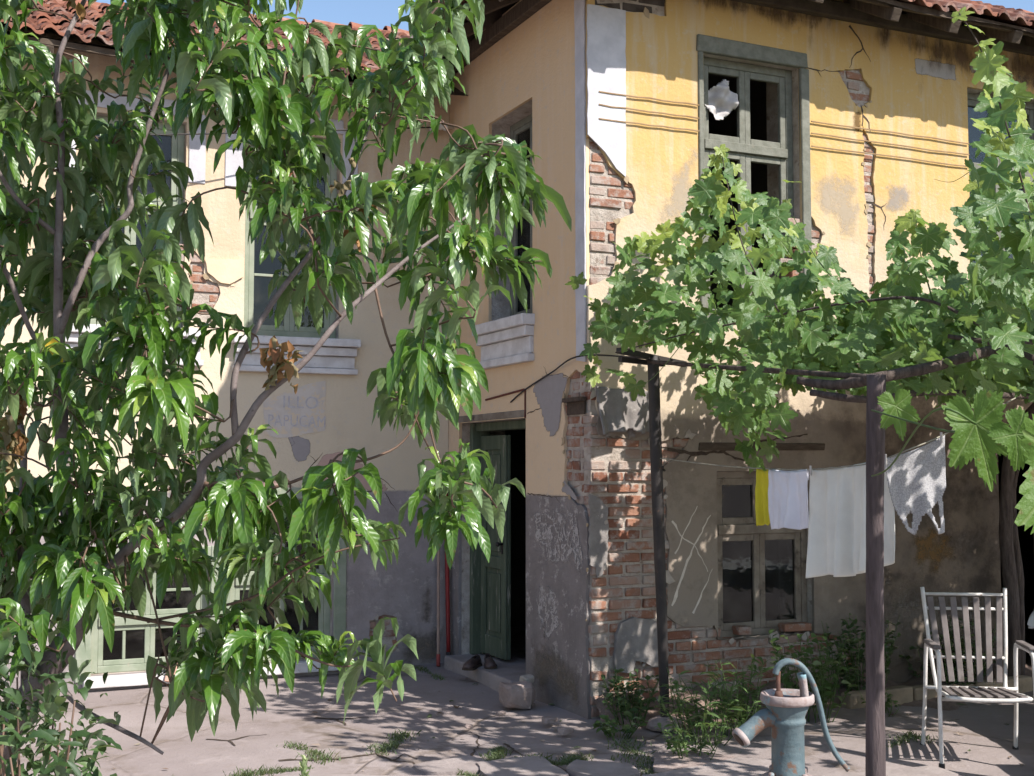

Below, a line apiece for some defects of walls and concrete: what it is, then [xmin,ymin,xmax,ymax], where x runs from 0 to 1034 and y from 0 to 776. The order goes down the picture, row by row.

flaking render [595,0,665,18]
crack [808,25,871,76]
flaking render [589,138,635,285]
flaking render [533,371,851,719]